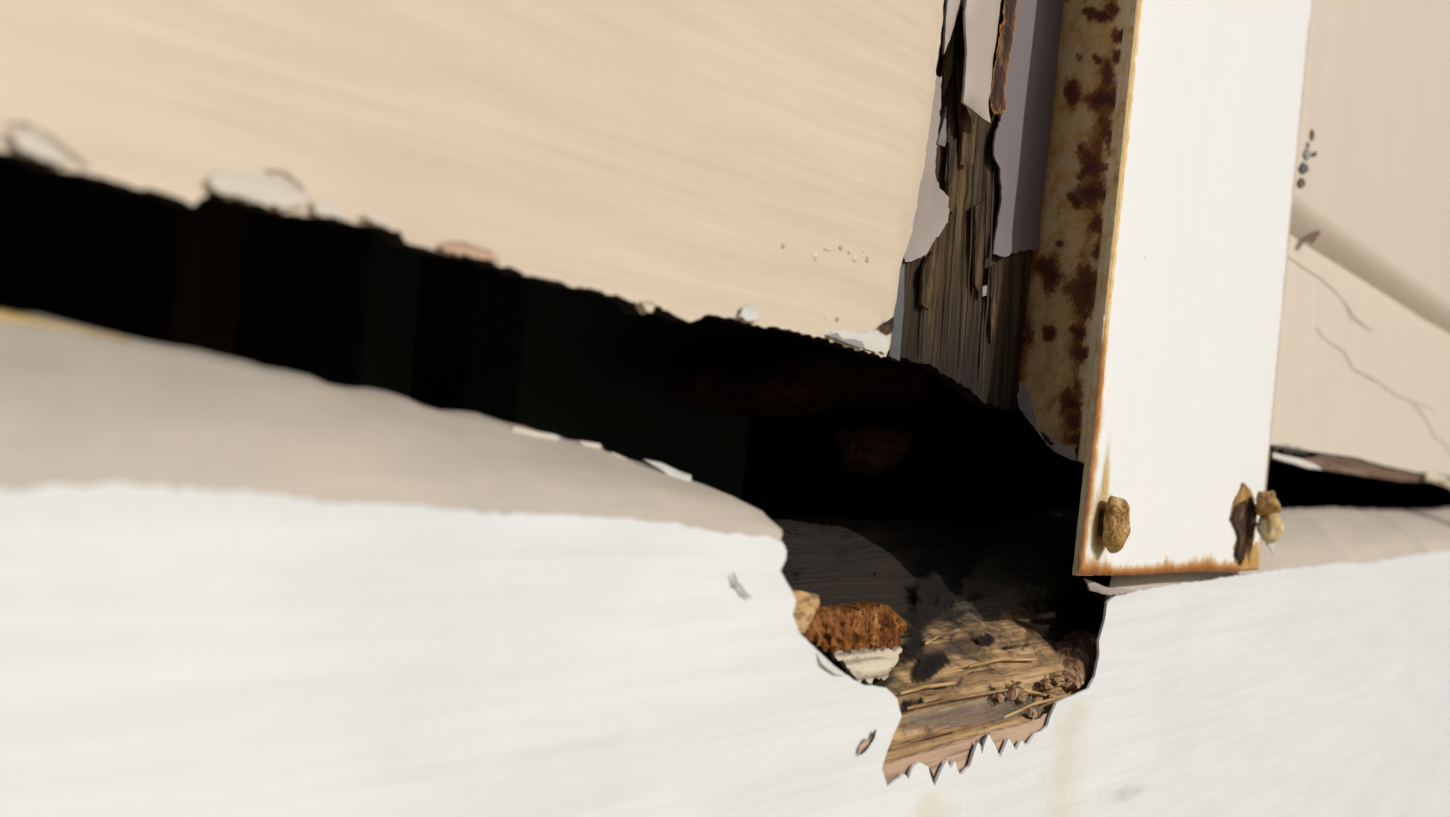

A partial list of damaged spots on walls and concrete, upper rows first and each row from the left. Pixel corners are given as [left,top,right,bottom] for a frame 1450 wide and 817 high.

peeling [7,122,91,168]
peeling [942,0,1064,257]
peeling [207,169,345,218]
peeling [438,241,501,263]
peeling [738,304,759,322]
peeling [825,75,950,361]
rust [1019,0,1310,576]
crack [1288,256,1450,453]
peeling [512,426,559,440]
peeling [579,441,691,481]
spalling [901,568,984,712]
spalling [976,578,1135,650]